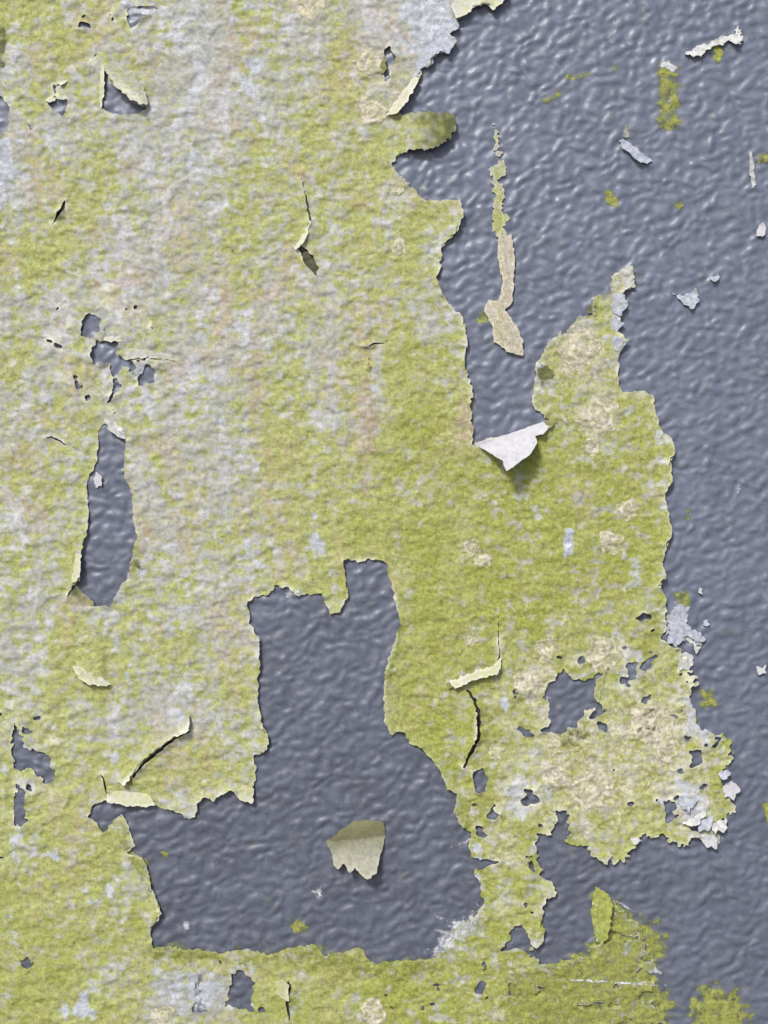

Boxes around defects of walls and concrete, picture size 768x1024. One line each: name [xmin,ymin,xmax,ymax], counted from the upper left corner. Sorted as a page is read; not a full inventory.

peeling [99,61,148,115]
peeling [385,0,503,156]
peeling [685,26,743,57]
crack [294,178,319,275]
peeling [484,123,524,356]
peeling [81,313,175,403]
peeling [474,418,557,471]
peeling [67,418,137,608]
crack [446,616,502,768]
peeling [544,668,609,733]
peeling [10,723,55,784]
peeling [88,558,504,964]